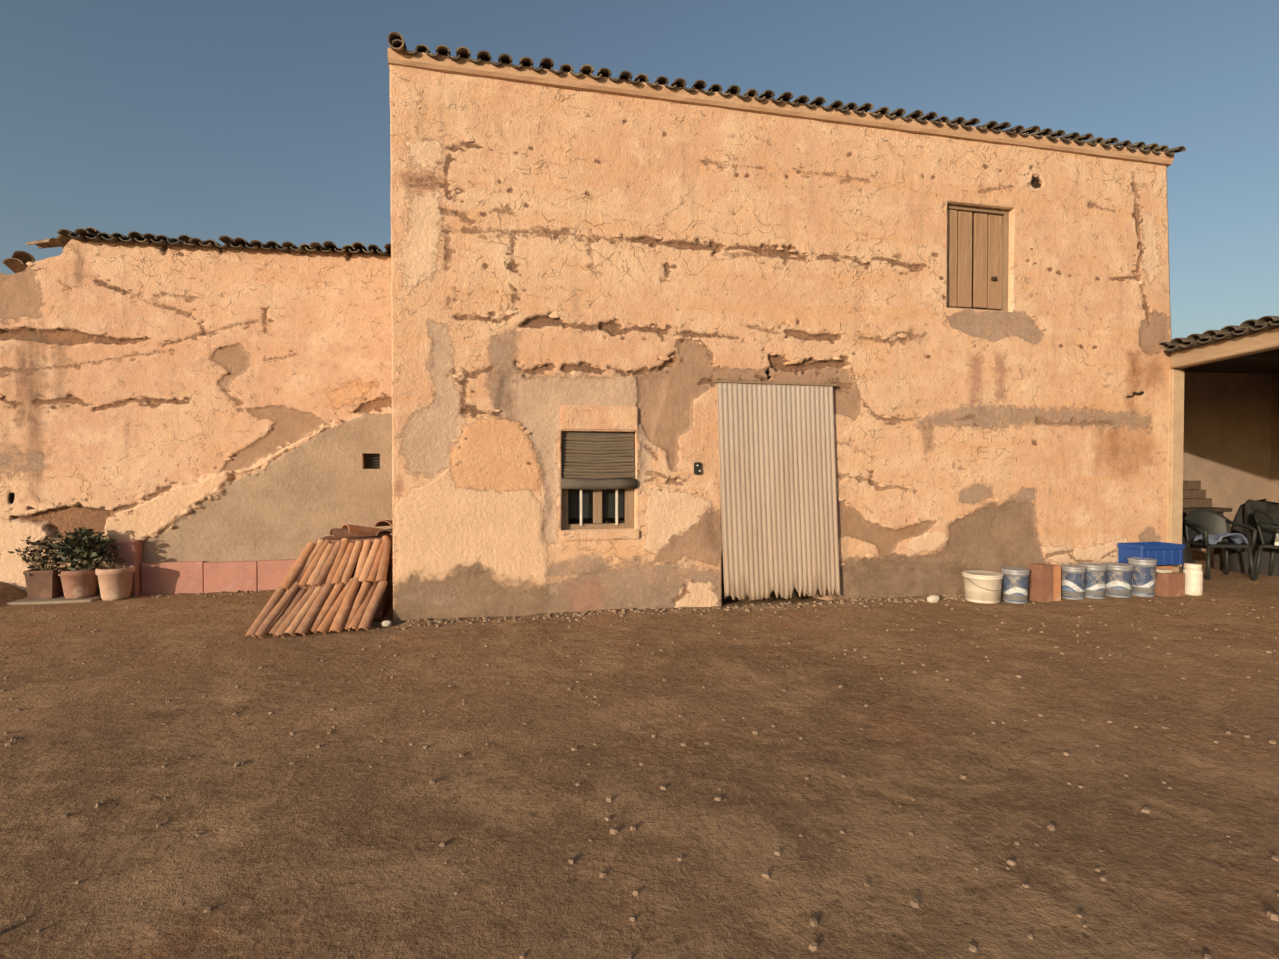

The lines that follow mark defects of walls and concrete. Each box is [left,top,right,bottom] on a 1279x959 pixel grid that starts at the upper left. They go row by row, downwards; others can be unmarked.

spalling [0,324,151,346]
flaking render [211,343,392,472]
flaking render [396,319,468,479]
flaking render [495,335,861,545]
crack [437,138,930,425]
crack [1035,417,1114,427]
crack [1048,175,1150,323]
flaking render [837,497,936,557]